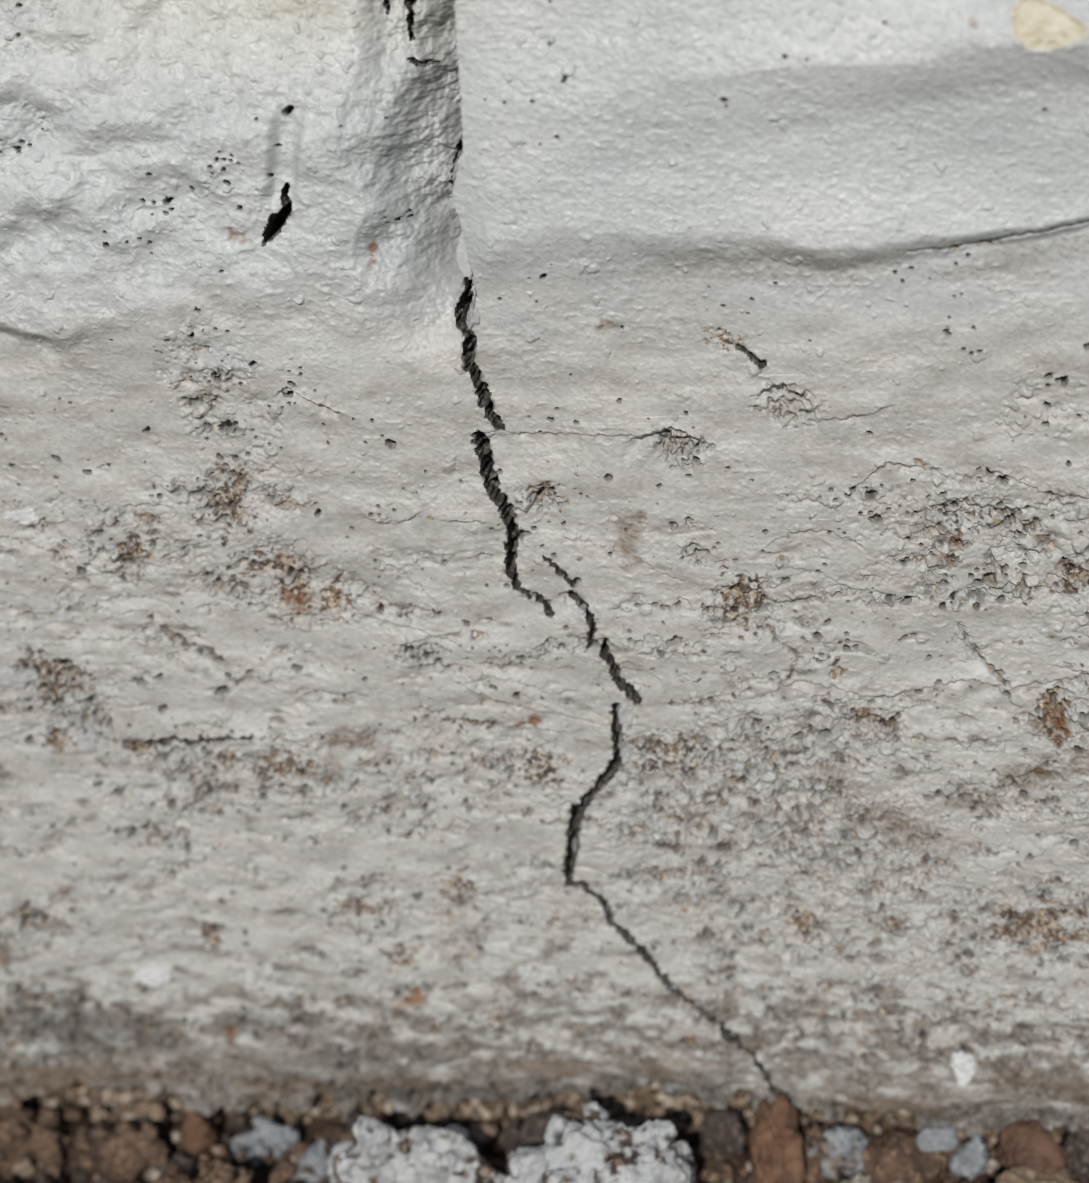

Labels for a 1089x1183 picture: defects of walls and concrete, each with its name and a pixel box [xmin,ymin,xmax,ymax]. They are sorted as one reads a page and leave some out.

crack [382,0,441,67]
peeling [1010,0,1088,53]
crack [448,139,463,186]
crack [455,264,790,1101]